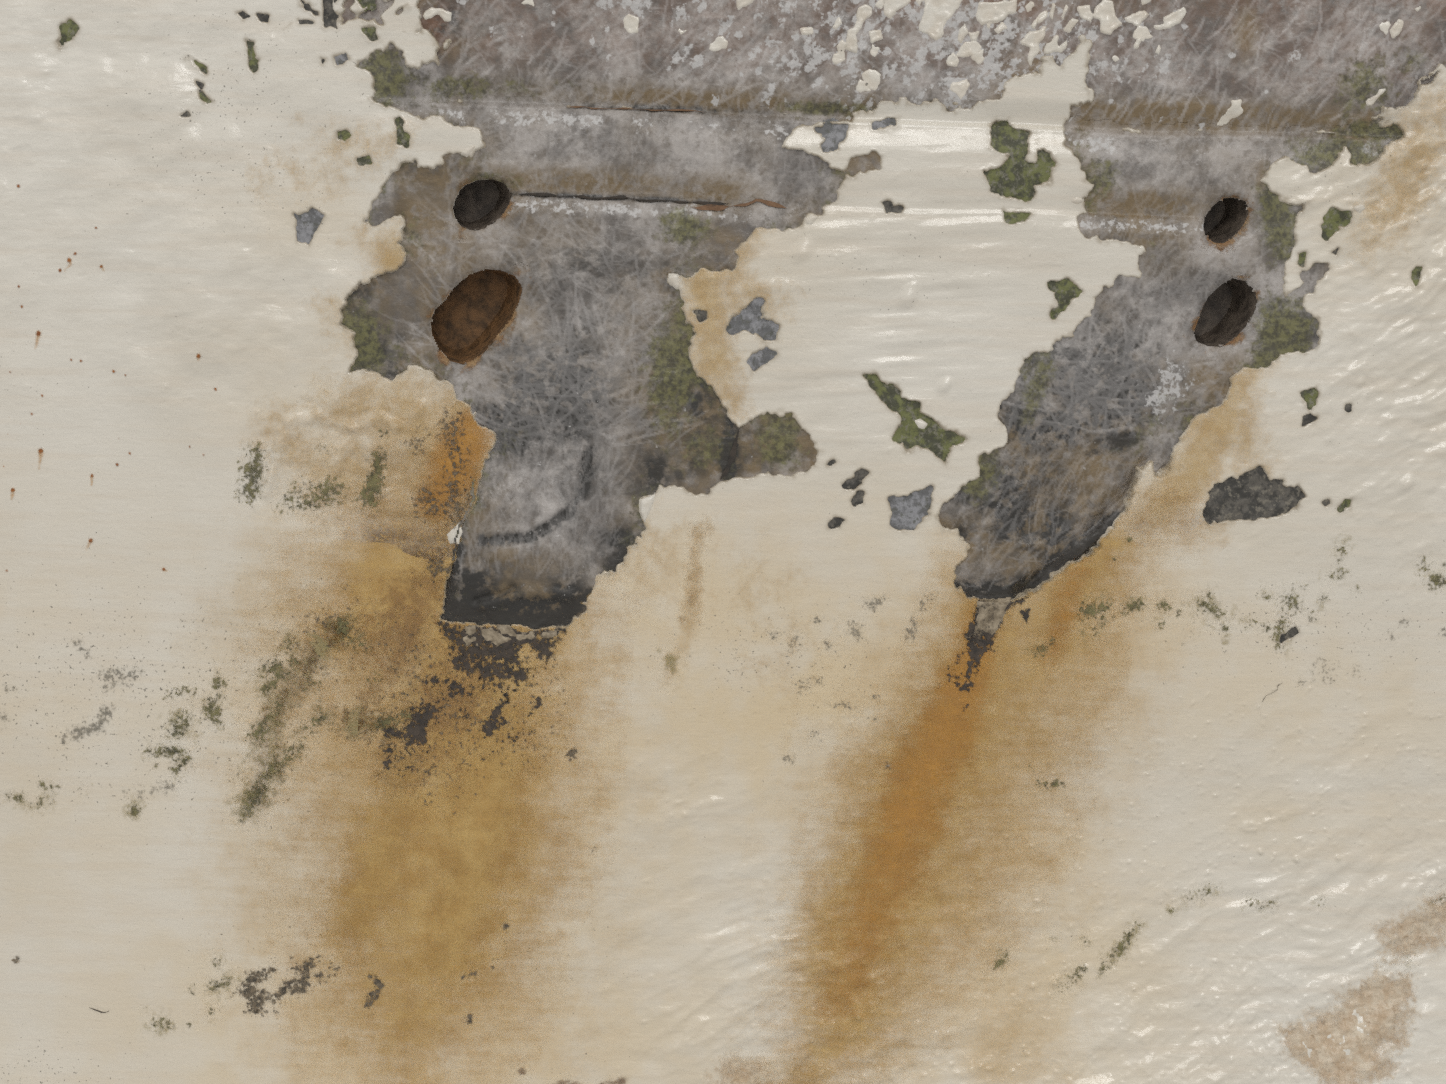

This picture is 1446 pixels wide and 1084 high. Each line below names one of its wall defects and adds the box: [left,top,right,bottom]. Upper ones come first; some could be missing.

peeling [294,208,324,244]
peeling [299,0,1446,630]
damp [61,668,143,744]
damp [162,677,228,742]
damp [276,578,577,814]
rust [333,400,565,1052]
rust [804,536,1129,1077]
peeling [1280,627,1299,643]